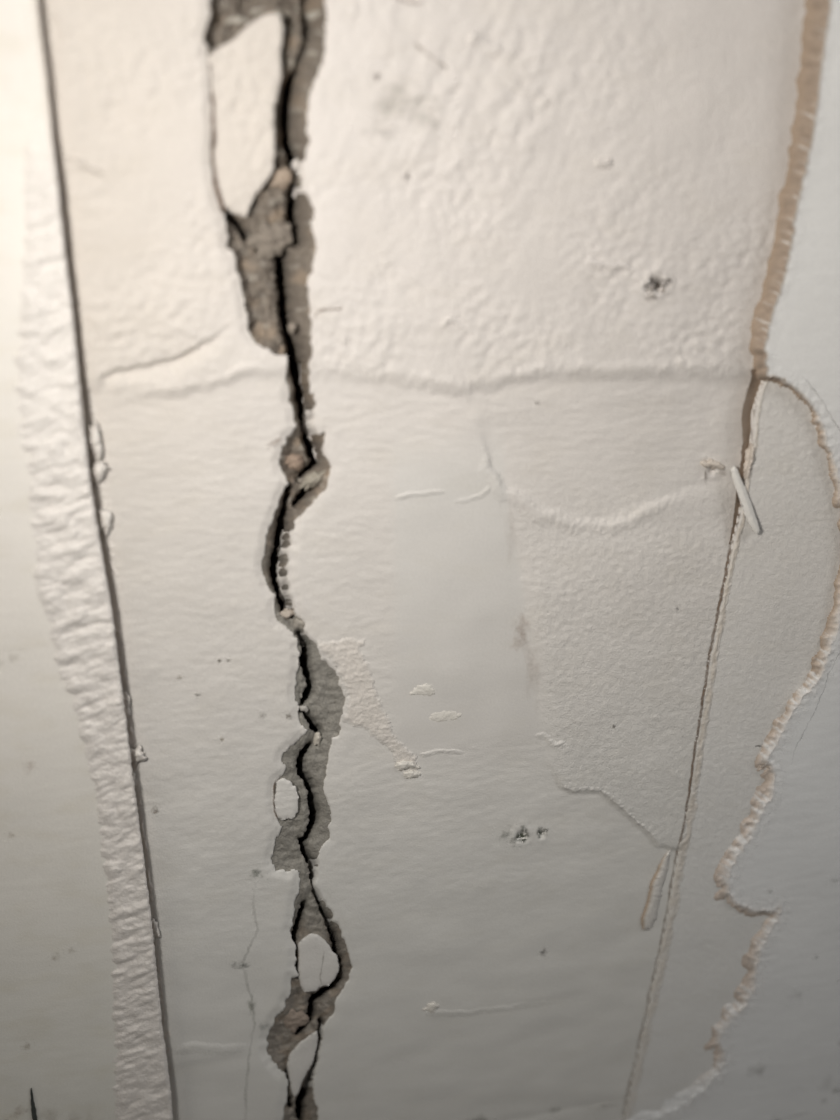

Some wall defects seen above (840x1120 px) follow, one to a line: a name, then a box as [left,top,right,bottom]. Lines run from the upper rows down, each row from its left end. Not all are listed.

crack [203,0,352,1120]
flaking render [317,637,418,771]
crack [624,369,769,1120]